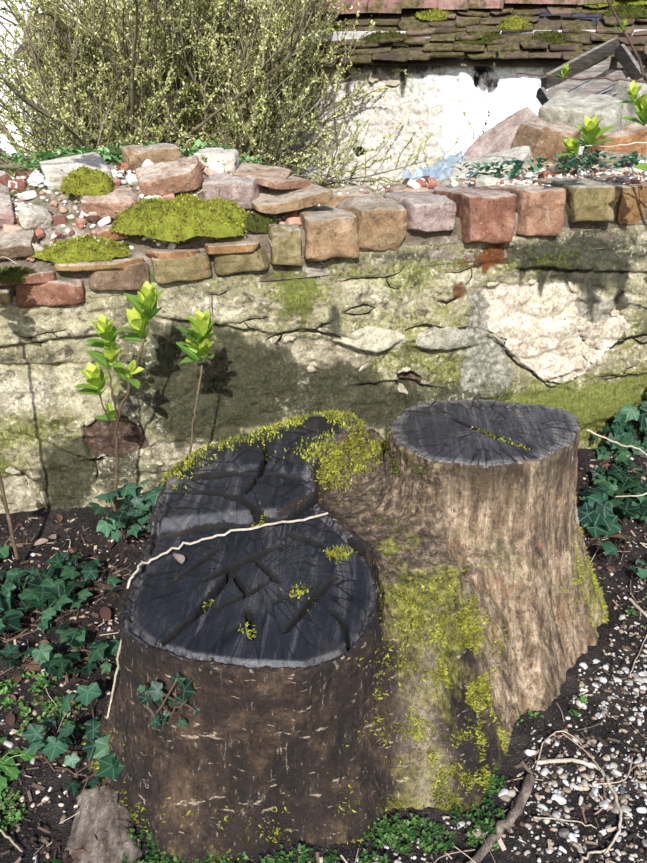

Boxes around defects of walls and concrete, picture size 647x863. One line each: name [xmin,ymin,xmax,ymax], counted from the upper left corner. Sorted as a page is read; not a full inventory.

spalling [473,66,498,92]
crack [437,262,513,304]
crack [405,316,647,389]